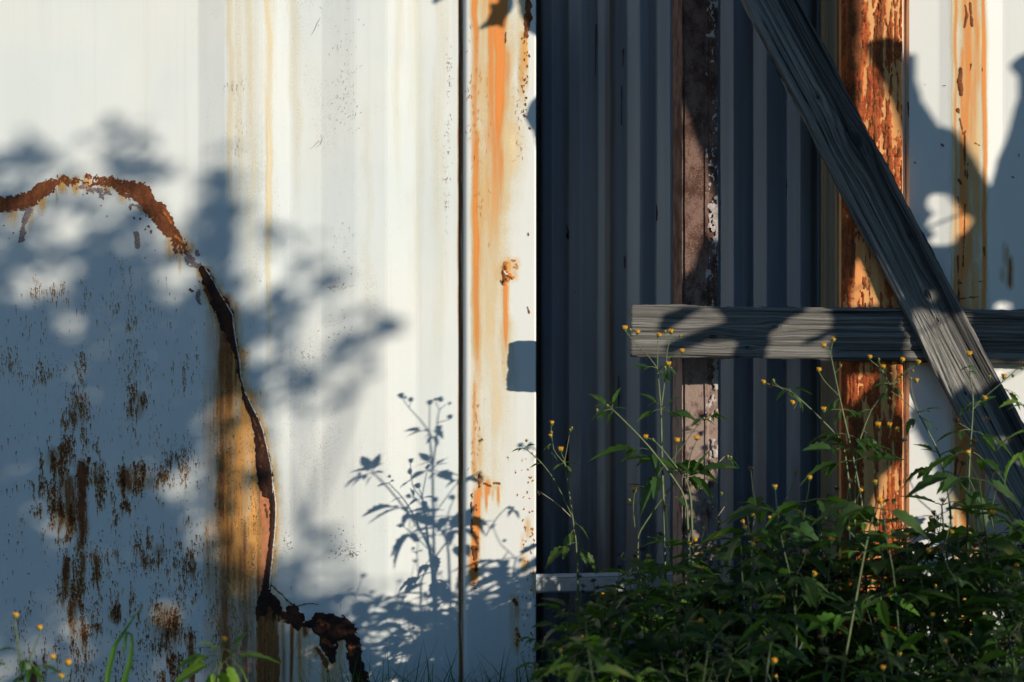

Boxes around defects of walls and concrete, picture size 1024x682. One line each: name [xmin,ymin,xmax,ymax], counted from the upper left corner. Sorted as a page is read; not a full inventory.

rust [1,252,370,682]
crack [197,266,319,617]
crack [331,526,359,562]
rust [458,0,533,682]
rust [841,197,893,308]
rust [841,361,906,598]
rust [841,0,907,201]
rust [951,411,985,564]
rust [951,0,988,310]